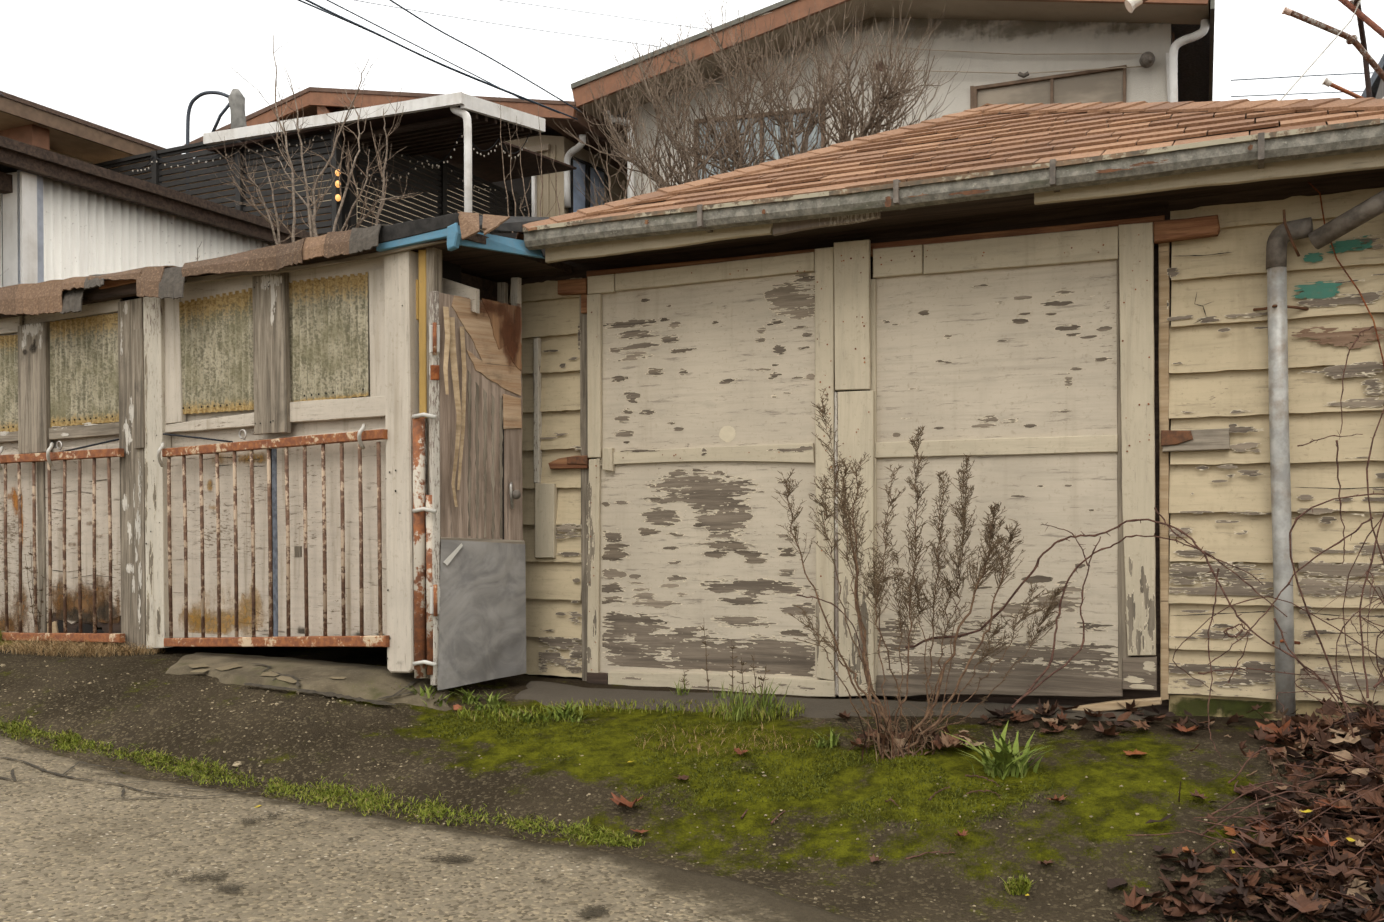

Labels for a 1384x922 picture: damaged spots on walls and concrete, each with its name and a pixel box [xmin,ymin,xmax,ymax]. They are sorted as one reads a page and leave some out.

peeling [1303,235,1384,263]
peeling [603,305,698,452]
peeling [718,273,815,398]
peeling [1167,300,1268,332]
peeling [1292,326,1384,408]
peeling [1293,274,1384,307]
corrosion [8,490,23,544]
peeling [538,448,820,691]